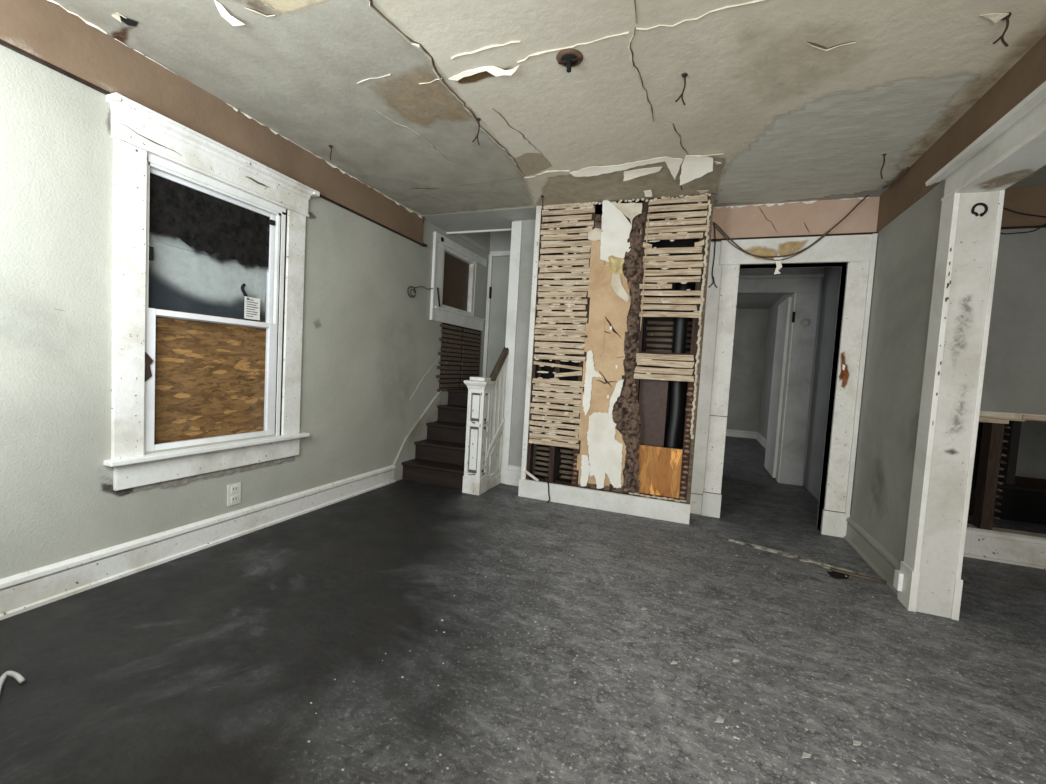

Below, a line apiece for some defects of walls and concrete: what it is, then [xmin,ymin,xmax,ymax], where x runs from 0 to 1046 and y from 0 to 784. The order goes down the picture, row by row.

crack [244,7,275,17]
flaking render [258,0,326,13]
crack [806,41,856,51]
damp [385,72,469,125]
crack [369,0,570,189]
crack [517,0,765,154]
crack [121,123,182,156]
spalling [539,153,818,493]
corrosion [839,353,849,388]